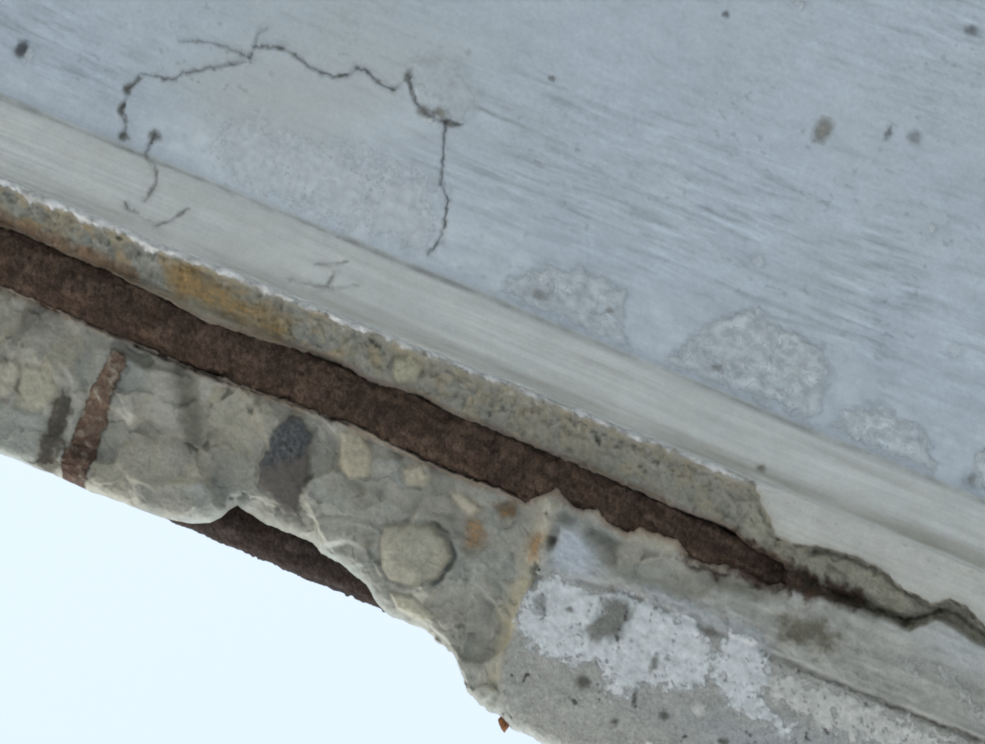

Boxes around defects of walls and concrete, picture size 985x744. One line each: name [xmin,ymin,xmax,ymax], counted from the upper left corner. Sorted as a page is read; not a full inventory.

spalling [0,185,985,713]
rust [689,528,866,612]
crack [786,571,876,611]
crack [899,596,958,625]